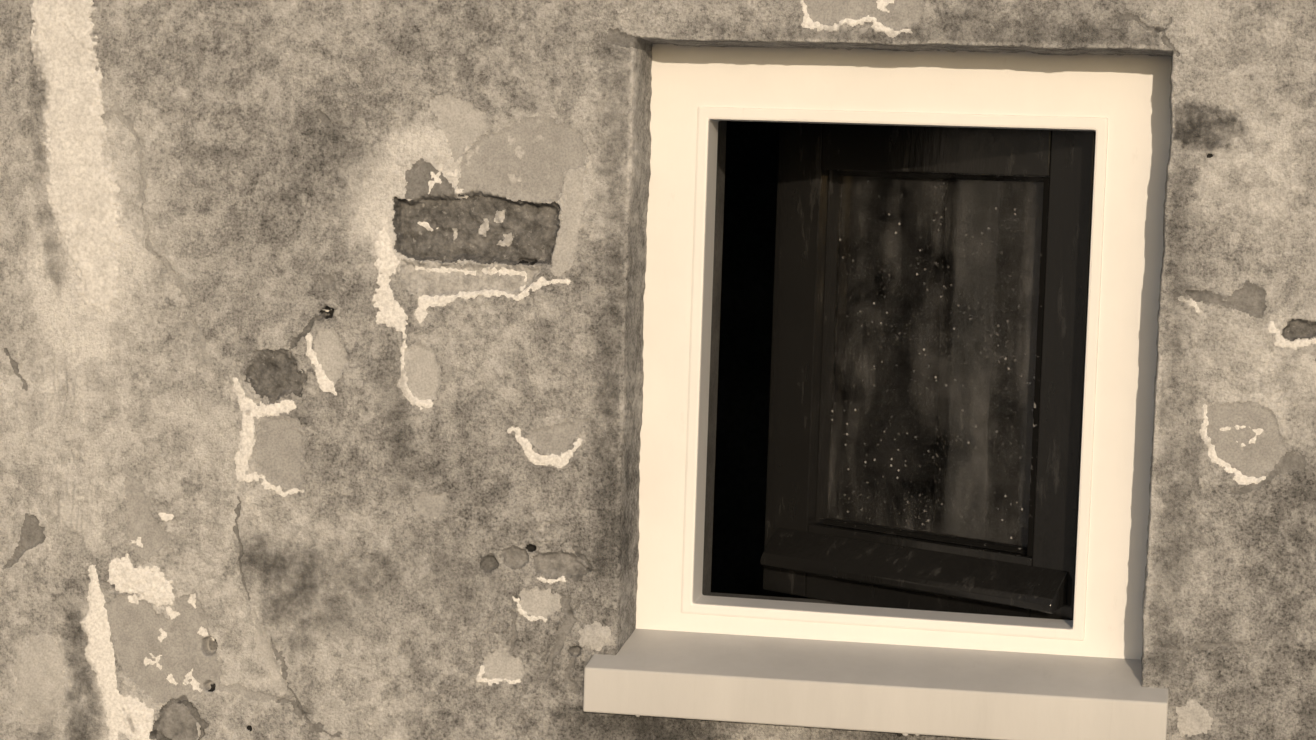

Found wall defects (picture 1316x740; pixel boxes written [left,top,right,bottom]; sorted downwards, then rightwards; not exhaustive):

peeling [800,0,924,38]
flaking render [380,92,588,323]
spalling [233,328,349,497]
crack [285,312,330,353]
spalling [397,340,441,410]
spalling [507,419,588,468]
spalling [1178,280,1316,371]
spalling [1199,401,1307,495]
crack [233,496,251,601]
flaking render [480,544,585,622]
peeling [104,591,222,740]